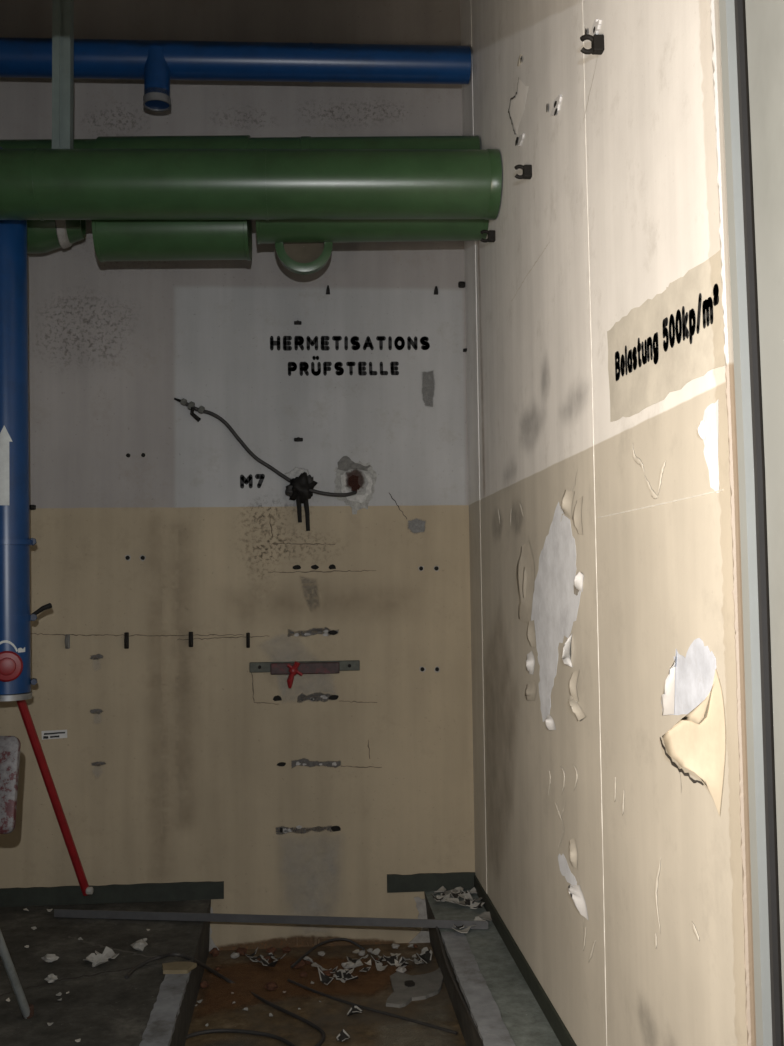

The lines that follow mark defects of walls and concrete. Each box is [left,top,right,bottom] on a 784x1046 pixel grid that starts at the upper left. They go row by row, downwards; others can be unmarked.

spalling [334,456,377,514]
peeling [698,400,720,493]
peeling [517,468,586,730]
peeling [660,638,726,816]
peeling [558,801,589,924]